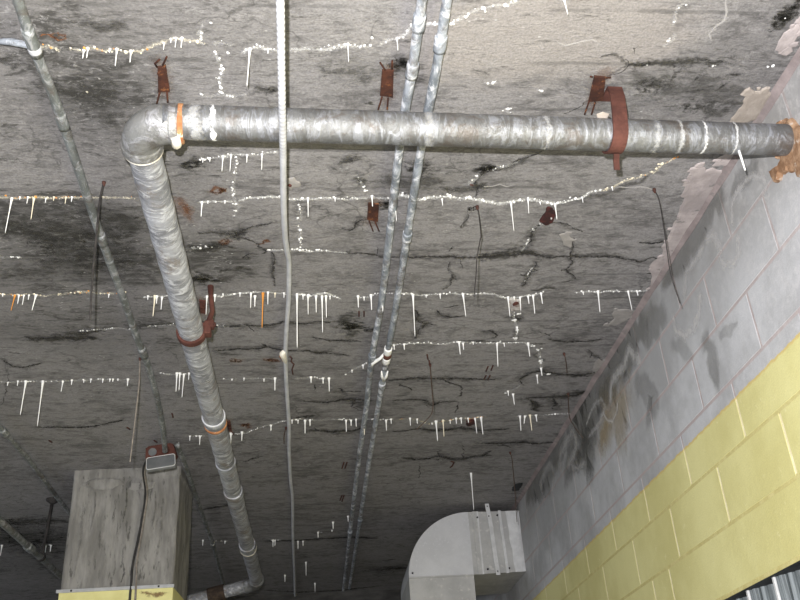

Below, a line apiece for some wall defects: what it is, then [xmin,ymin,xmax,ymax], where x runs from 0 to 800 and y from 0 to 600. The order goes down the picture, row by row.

efflorescence [70,32,203,66]
peeling [778,17,800,56]
peeling [740,86,770,97]
spalling [769,118,800,183]
efflorescence [0,195,135,232]
damp [182,151,679,252]
crack [351,222,663,338]
damp [204,291,358,344]
crack [218,321,362,355]
efflorescence [357,286,554,383]
crack [520,332,601,410]
crack [390,377,553,478]